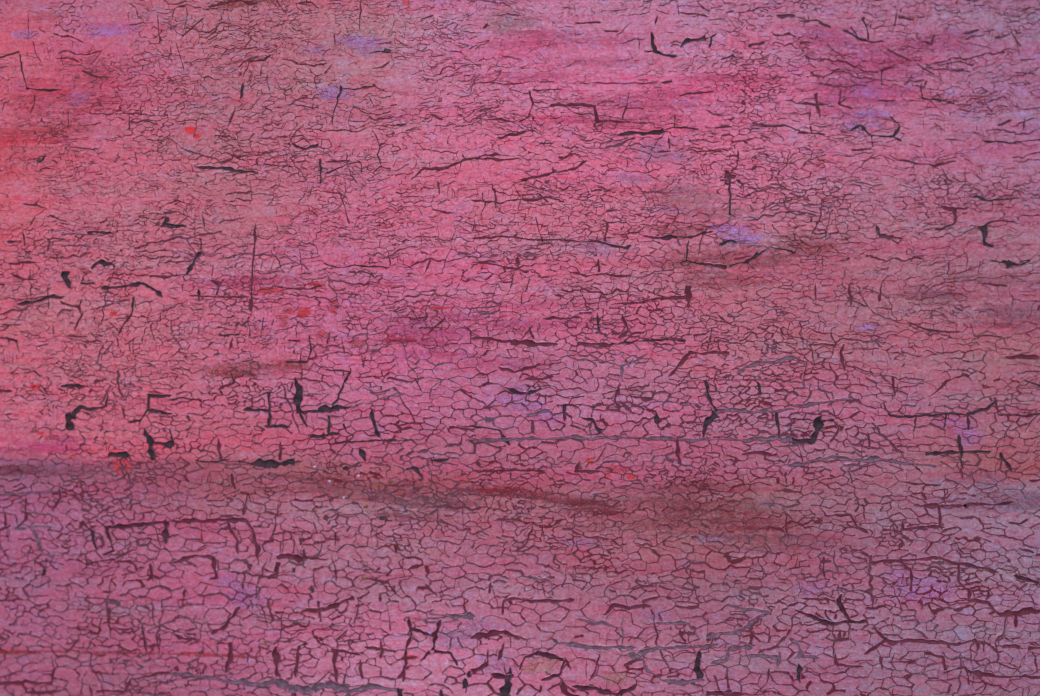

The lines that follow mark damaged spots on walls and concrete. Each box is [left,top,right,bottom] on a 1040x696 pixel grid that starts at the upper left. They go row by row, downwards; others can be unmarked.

crack [157,0,318,69]
crack [197,8,1040,289]
crack [0,203,249,461]
crack [0,284,1040,696]